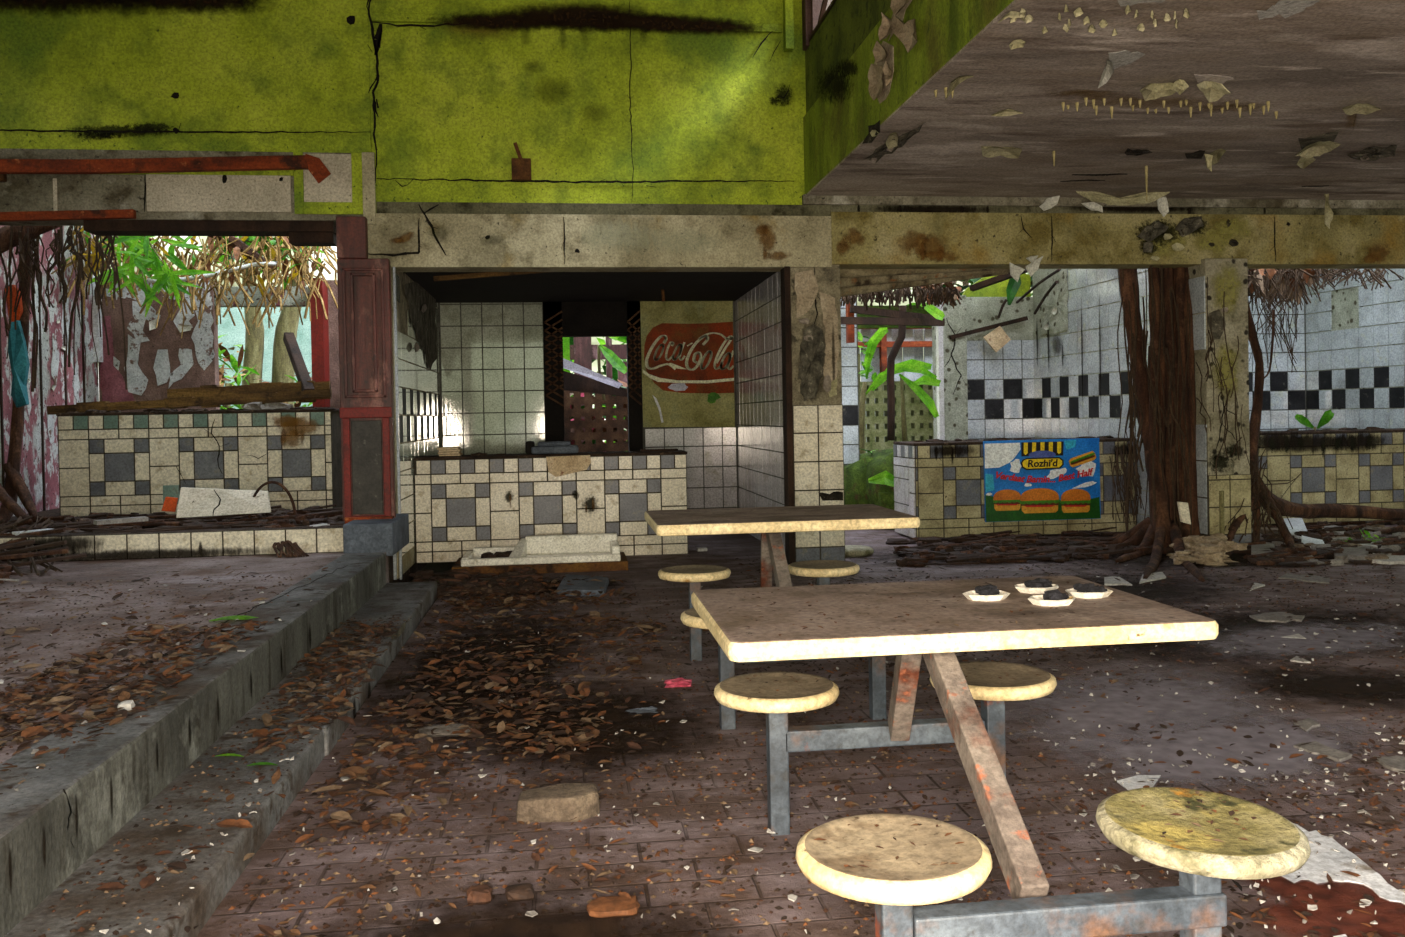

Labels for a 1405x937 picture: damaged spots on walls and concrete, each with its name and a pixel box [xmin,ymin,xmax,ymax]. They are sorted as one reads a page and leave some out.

leakage [0,0,97,11]
leakage [122,0,258,11]
leakage [442,4,754,34]
peeling [1117,0,1190,31]
peeling [998,4,1145,88]
peeling [1140,74,1234,103]
crack [0,0,794,264]
peeling [1039,196,1060,211]
spalling [1076,191,1204,261]
corrosion [837,229,863,253]
corrosion [902,232,955,261]